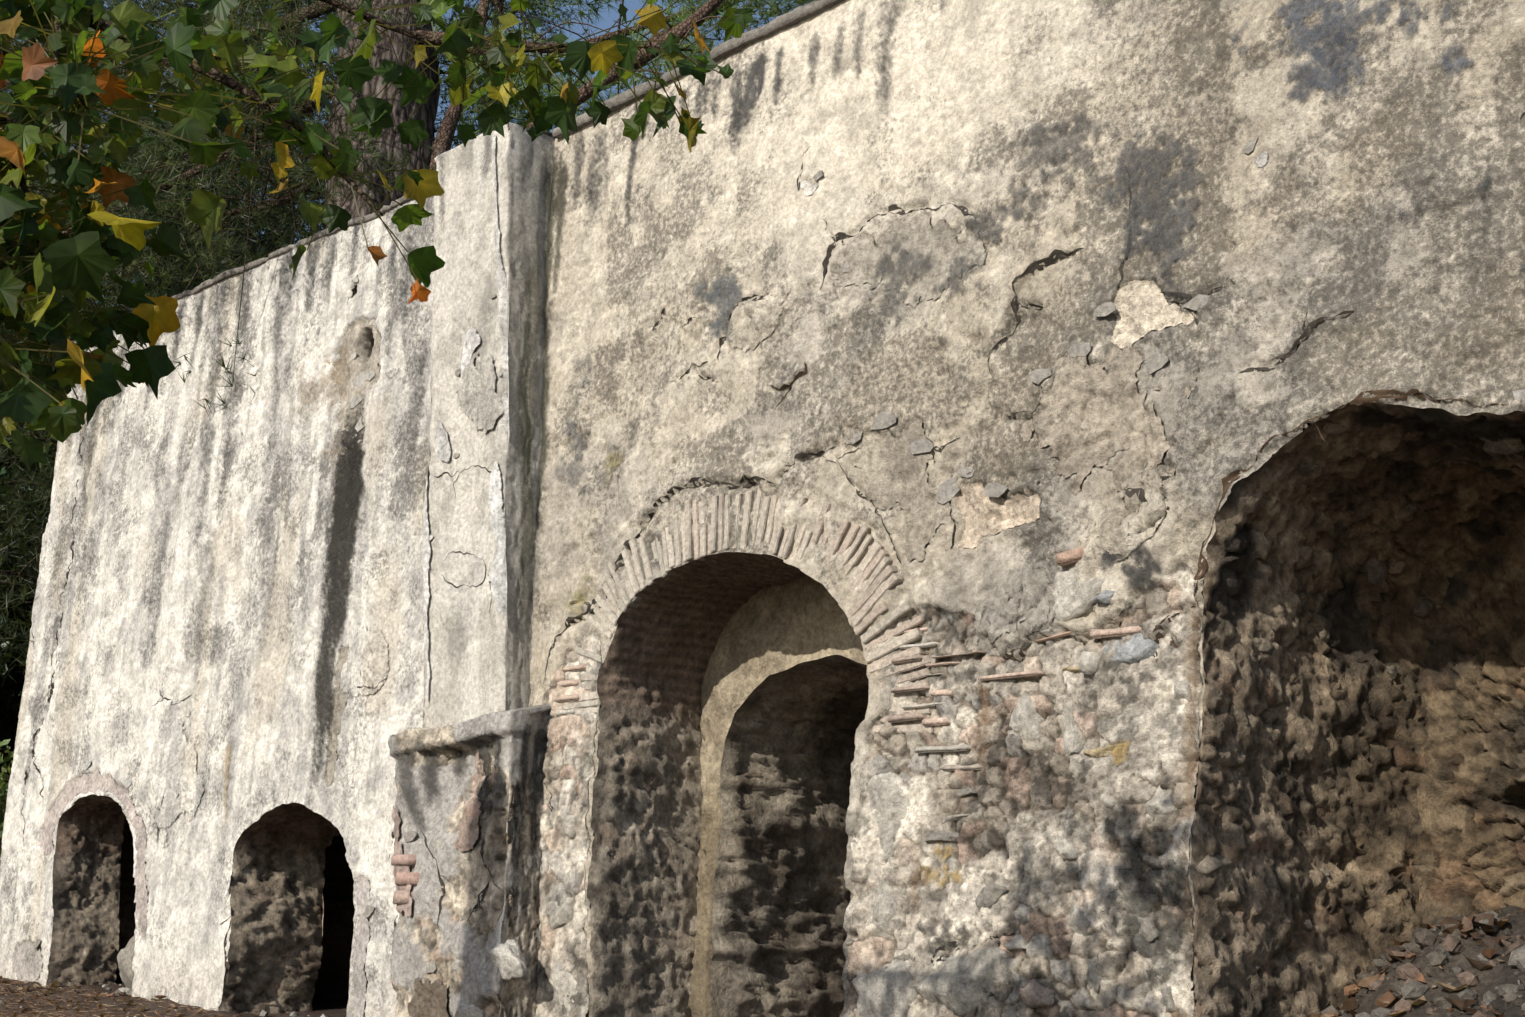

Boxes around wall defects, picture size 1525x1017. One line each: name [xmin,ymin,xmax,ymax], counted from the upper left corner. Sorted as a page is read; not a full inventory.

leakage [670,46,783,152]
leakage [808,0,898,107]
crack [820,202,977,289]
crack [988,248,1082,381]
leakage [934,113,1203,300]
flaking render [1019,280,1210,495]
crack [1160,278,1235,325]
crack [1239,304,1354,373]
leakage [310,406,364,787]
flaking render [842,547,1205,1017]
flaking render [391,805,420,917]
flaking render [407,956,484,1017]